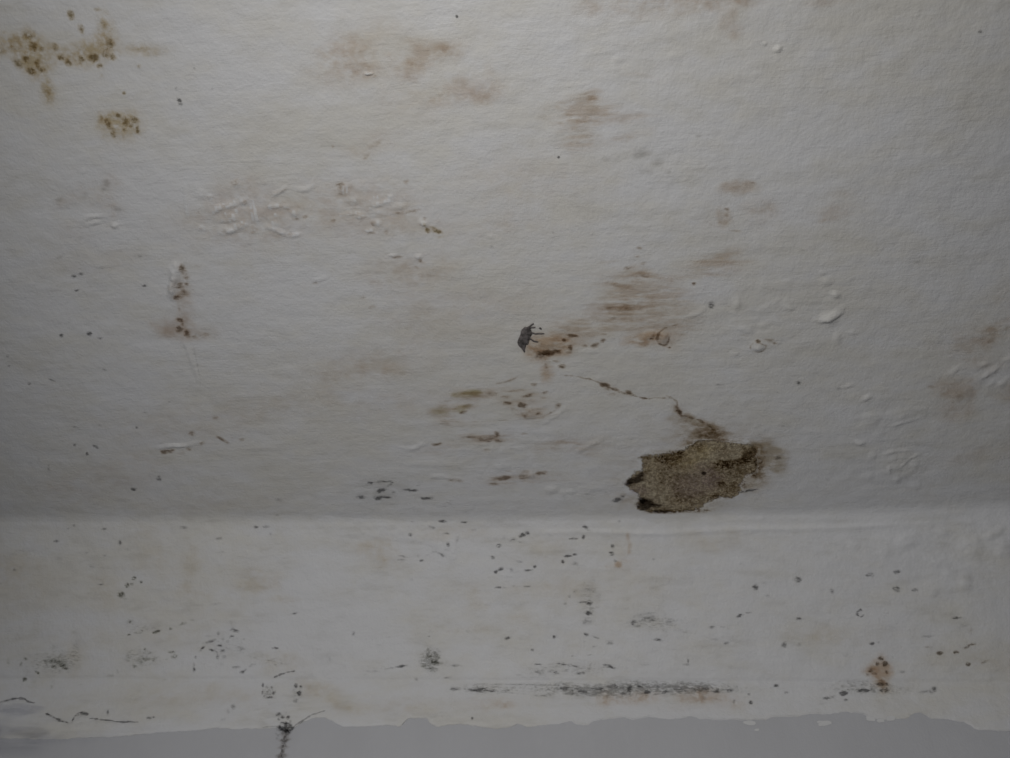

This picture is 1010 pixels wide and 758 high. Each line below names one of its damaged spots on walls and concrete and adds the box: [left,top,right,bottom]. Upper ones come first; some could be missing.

peeling [614,429,768,524]